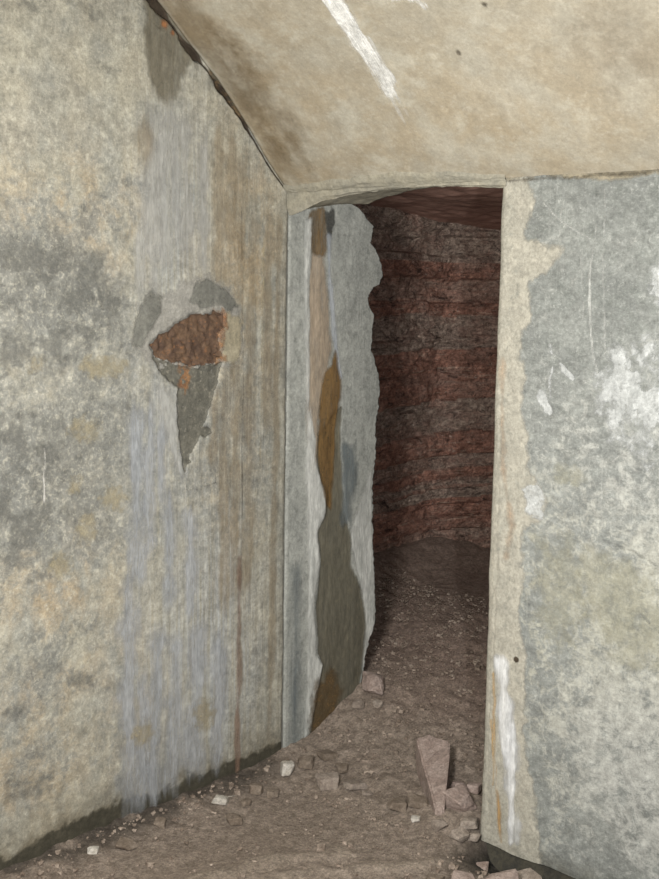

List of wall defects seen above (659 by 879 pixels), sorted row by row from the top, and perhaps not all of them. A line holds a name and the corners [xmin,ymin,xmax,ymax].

water stain [144,0,190,101]
water stain [322,0,397,98]
flaking render [133,275,242,476]
water stain [488,538,520,845]